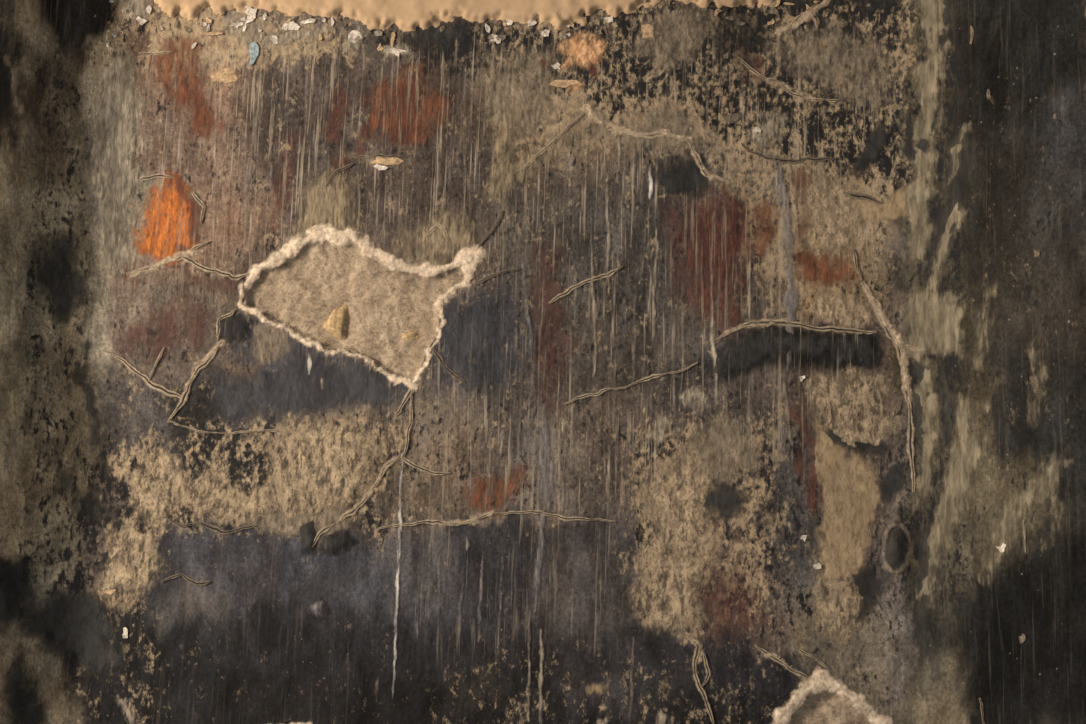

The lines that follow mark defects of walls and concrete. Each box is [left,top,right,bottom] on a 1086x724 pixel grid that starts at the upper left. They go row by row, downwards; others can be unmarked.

rust [134,172,201,264]
spalling [237,172,486,391]
damp [532,419,560,583]
spalling [773,667,892,724]